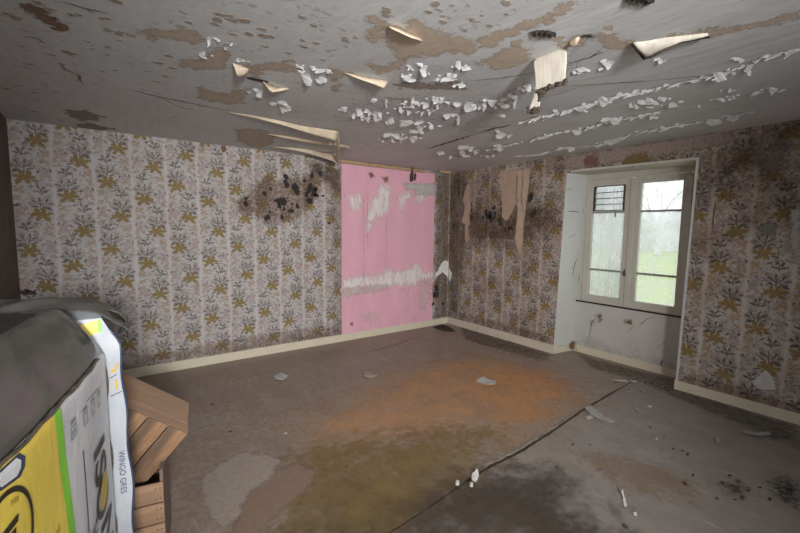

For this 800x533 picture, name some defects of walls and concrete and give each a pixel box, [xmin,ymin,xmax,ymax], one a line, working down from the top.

peeling [2,0,82,32]
peeling [82,12,355,92]
peeling [197,87,291,114]
peeling [233,129,276,149]
peeling [338,1,636,143]
flaking render [436,48,800,169]
damp [237,162,340,224]
damp [432,176,553,317]